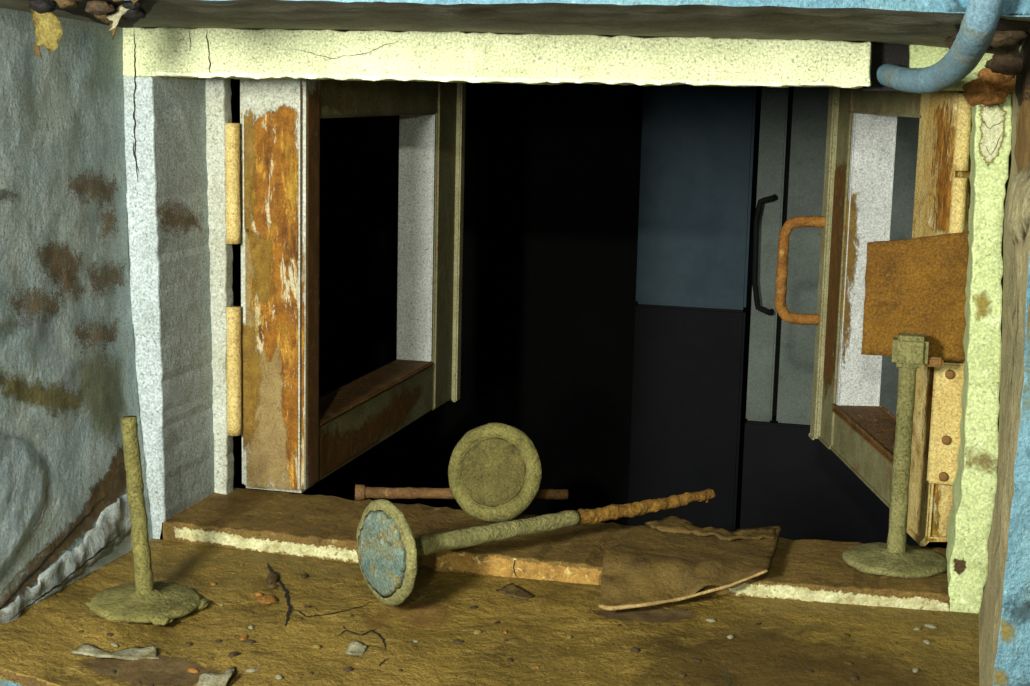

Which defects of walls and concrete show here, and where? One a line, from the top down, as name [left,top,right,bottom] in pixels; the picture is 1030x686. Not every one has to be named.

spalling [28,0,158,58]
crack [132,33,140,181]
rust [241,82,422,491]
flaking render [0,493,131,625]
peeling [172,525,359,563]
peeling [421,548,601,600]
peeling [0,668,53,686]
peeling [70,643,159,661]
peeling [196,667,236,686]
peeling [344,640,368,656]